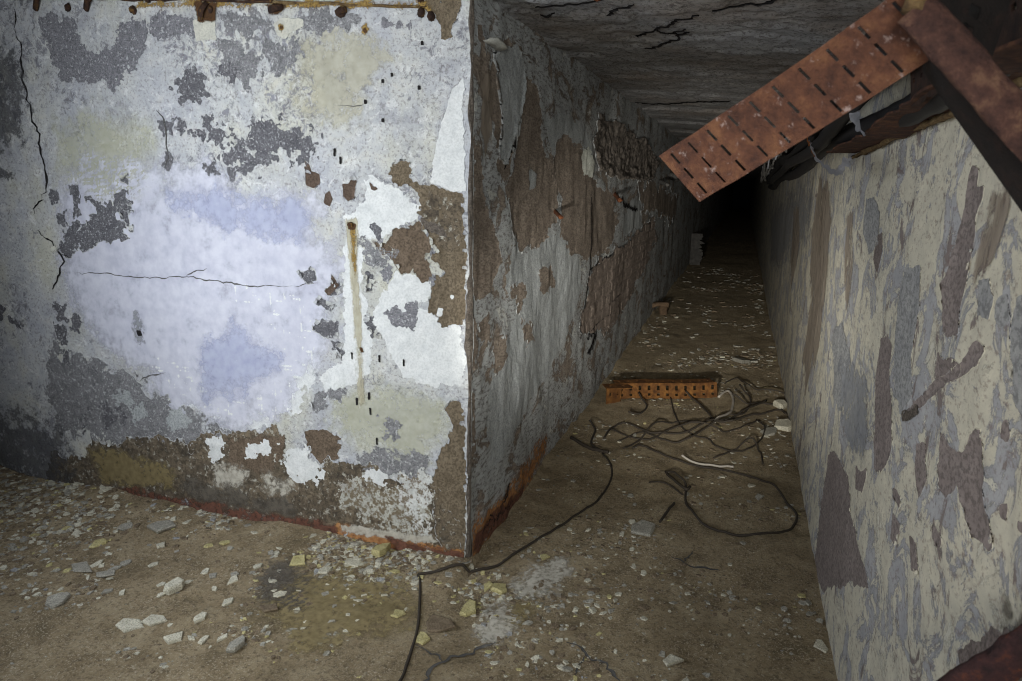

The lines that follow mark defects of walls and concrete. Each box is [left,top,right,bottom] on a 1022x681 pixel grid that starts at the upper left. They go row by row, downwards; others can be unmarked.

rust [136,0,372,32]
crack [535,0,634,18]
crack [635,0,776,49]
crack [14,9,314,289]
rust [346,218,364,404]
peeling [38,0,679,558]
rust [802,176,831,396]
rust [844,212,853,308]
rust [111,434,547,558]
spalling [345,558,362,567]